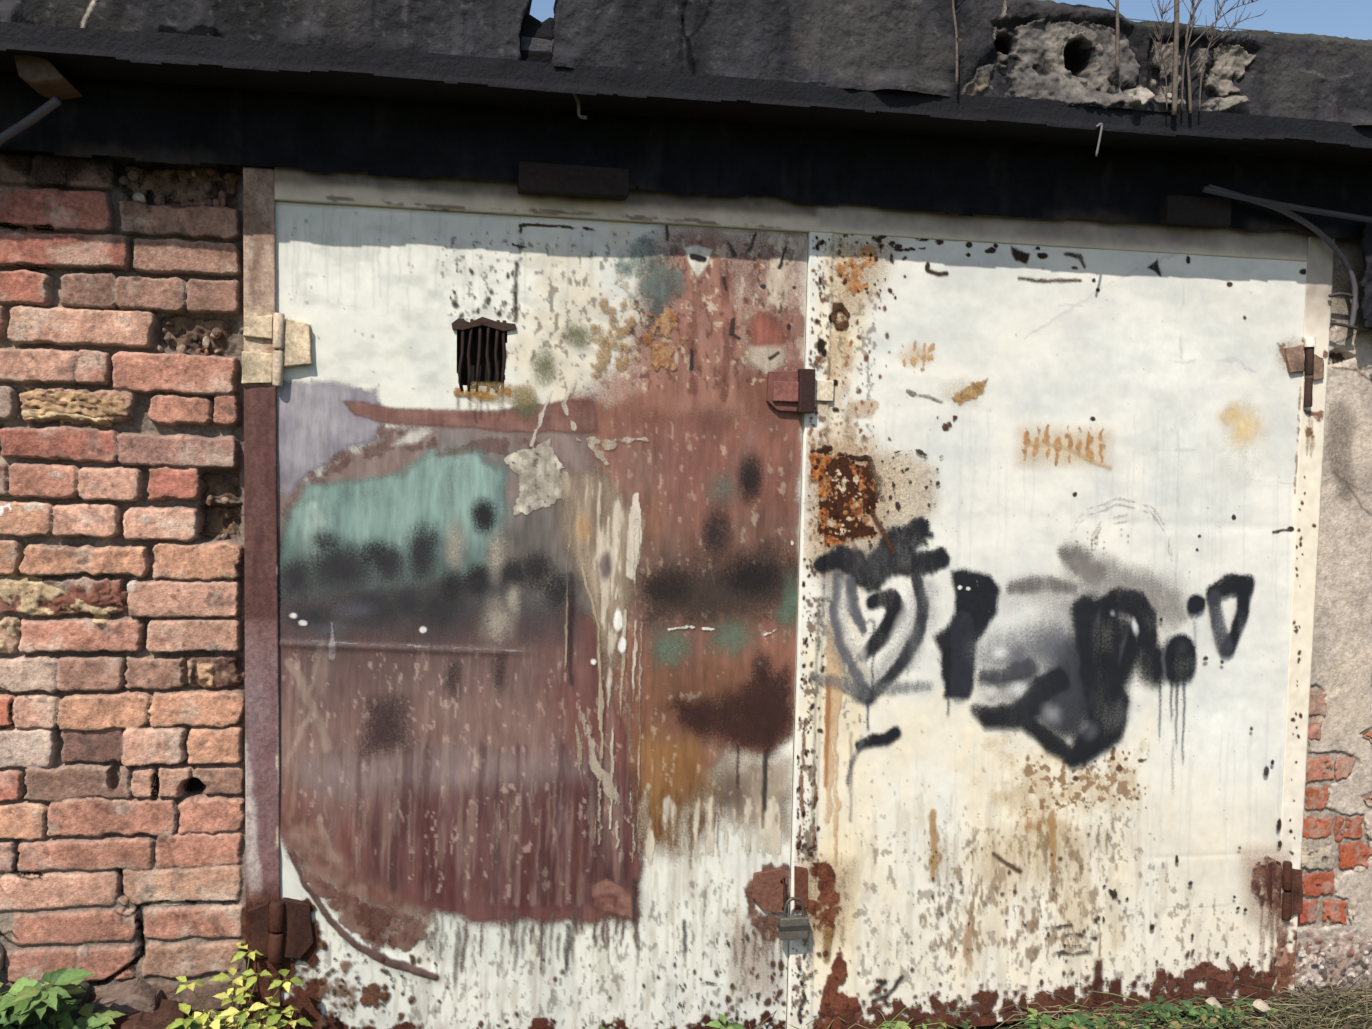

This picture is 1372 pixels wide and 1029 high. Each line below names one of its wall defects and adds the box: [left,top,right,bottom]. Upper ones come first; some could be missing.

spalling [962,3,1186,108]
spalling [1197,43,1256,112]
corrosion [655,234,1301,1029]
peeling [1298,686,1372,993]
peeling [591,879,637,921]
corrosion [240,898,436,1029]
peeling [662,930,761,1015]
corrosion [460,1012,556,1029]
corrosion [582,1018,637,1029]